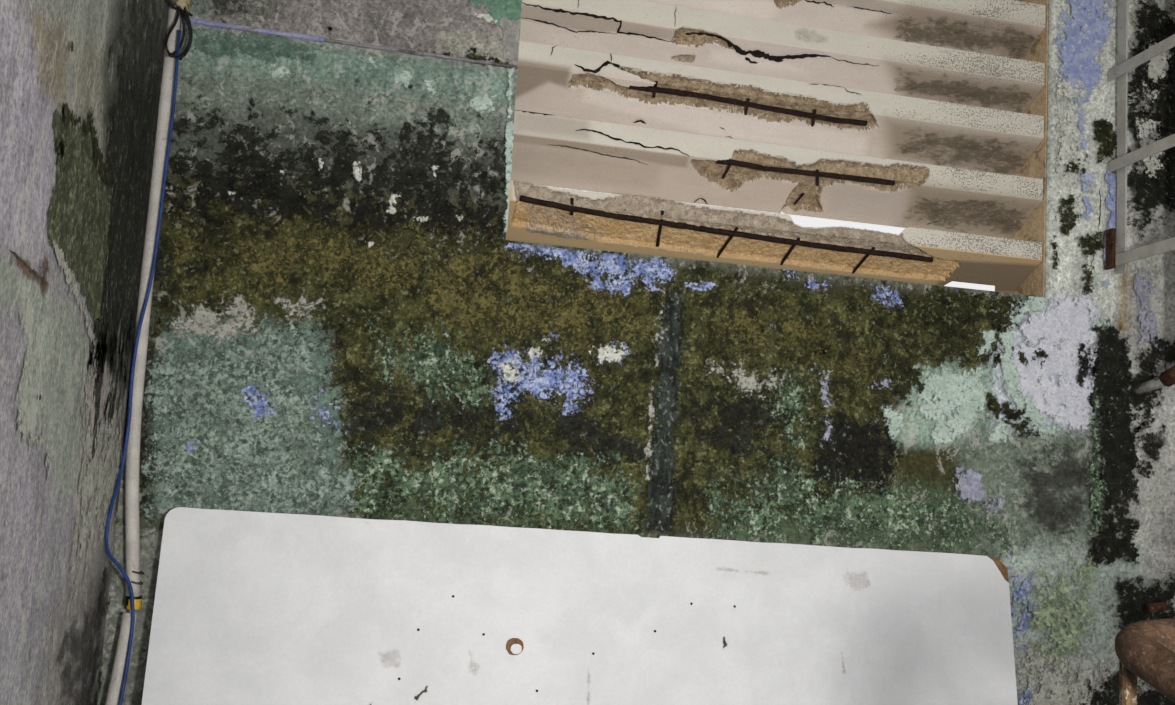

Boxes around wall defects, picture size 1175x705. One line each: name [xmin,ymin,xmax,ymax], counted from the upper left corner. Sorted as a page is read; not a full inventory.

damp [163,77,507,242]
crack [521,0,873,95]
spalling [568,27,878,131]
crack [805,0,892,14]
damp [1127,0,1175,238]
damp [62,0,175,517]
spalling [469,68,960,366]
peeling [487,331,631,421]
peeling [707,359,784,400]
peeling [811,363,834,441]
damp [1079,669,1119,705]
damp [1137,679,1175,705]